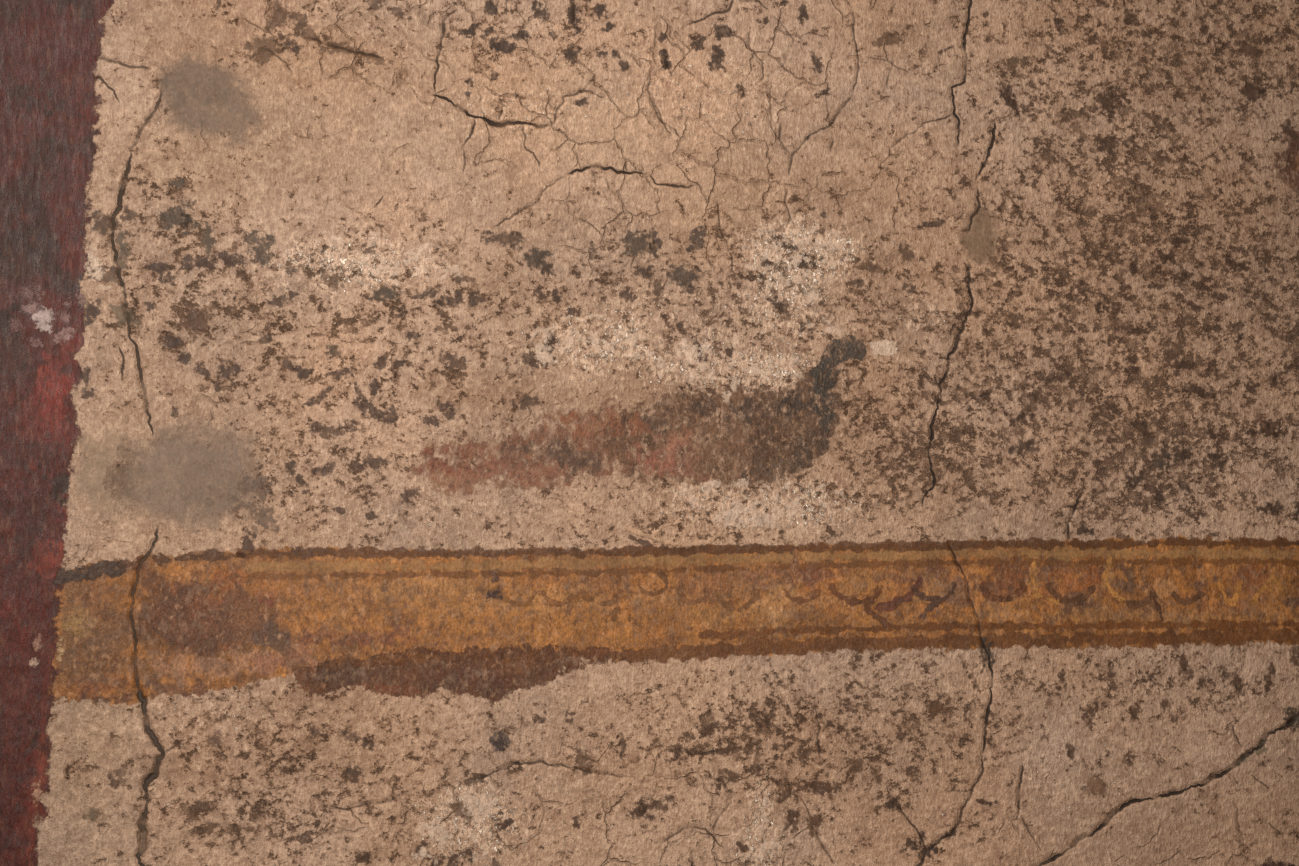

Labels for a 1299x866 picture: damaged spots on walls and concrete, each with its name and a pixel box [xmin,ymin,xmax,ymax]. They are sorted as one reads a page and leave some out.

crack [99,60,161,124]
crack [433,11,693,226]
crack [691,1,733,23]
crack [778,26,859,171]
crack [897,0,996,230]
crack [111,153,153,433]
crack [922,266,974,505]
crack [129,528,165,866]
crack [901,548,993,866]
crack [1016,766,1024,811]
crack [1037,719,1295,866]